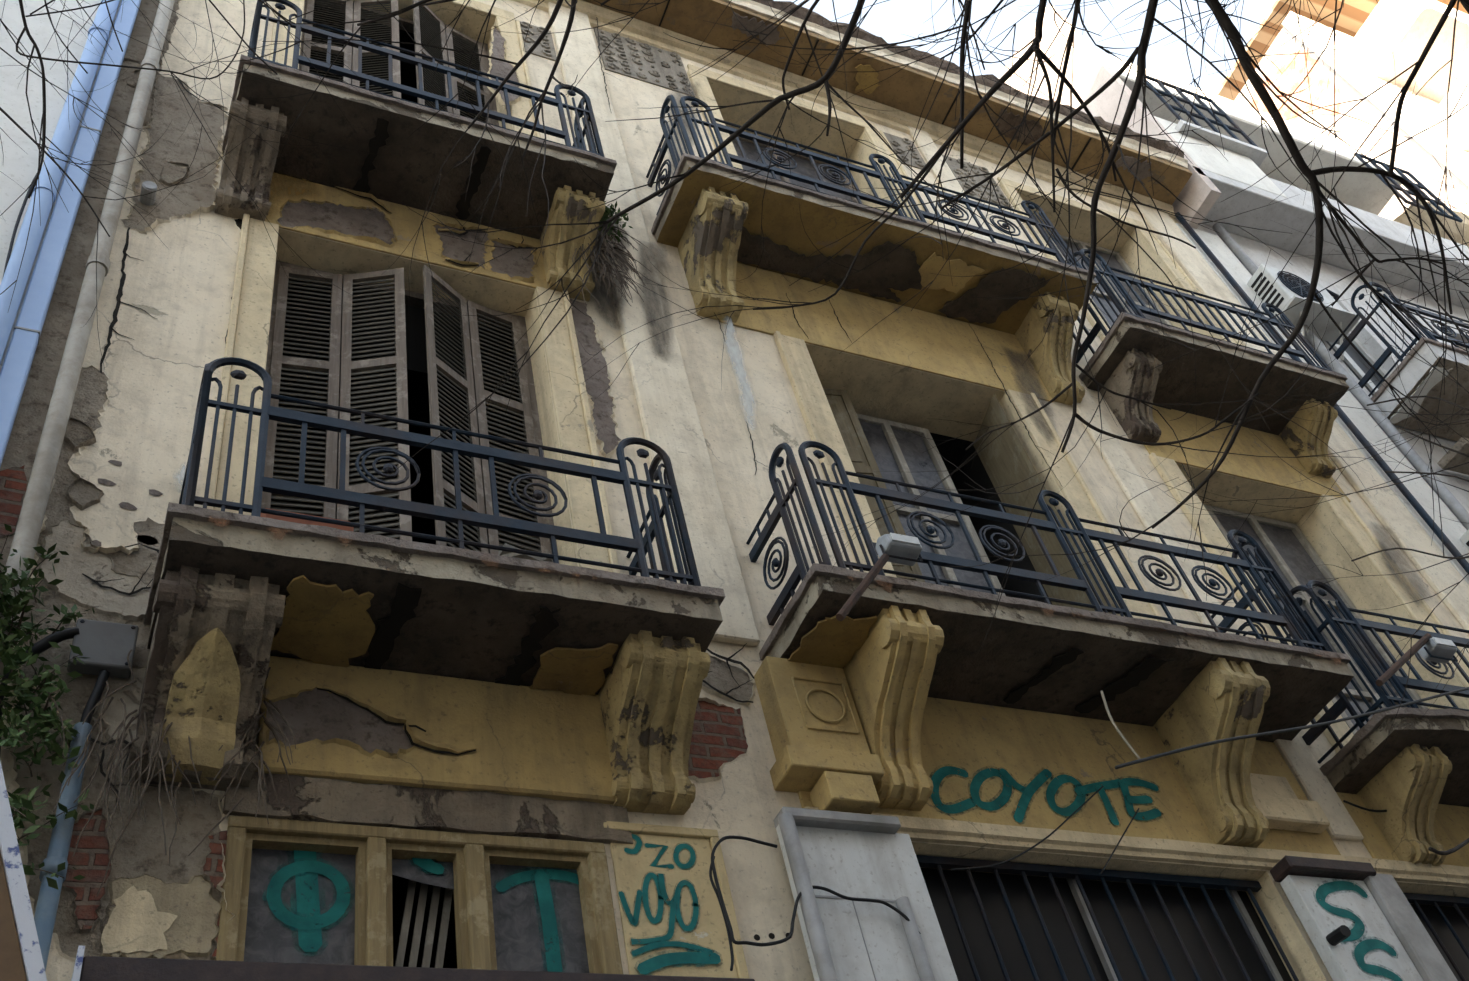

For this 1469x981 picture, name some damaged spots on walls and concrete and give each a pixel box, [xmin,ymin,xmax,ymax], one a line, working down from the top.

peeling [117,0,228,234]
spalling [275,118,398,248]
crack [100,227,157,373]
spalling [737,227,1050,324]
flaking render [0,465,27,539]
peeling [5,365,235,962]
spalling [261,687,416,759]
peeling [271,575,422,670]
flaking render [688,653,756,783]